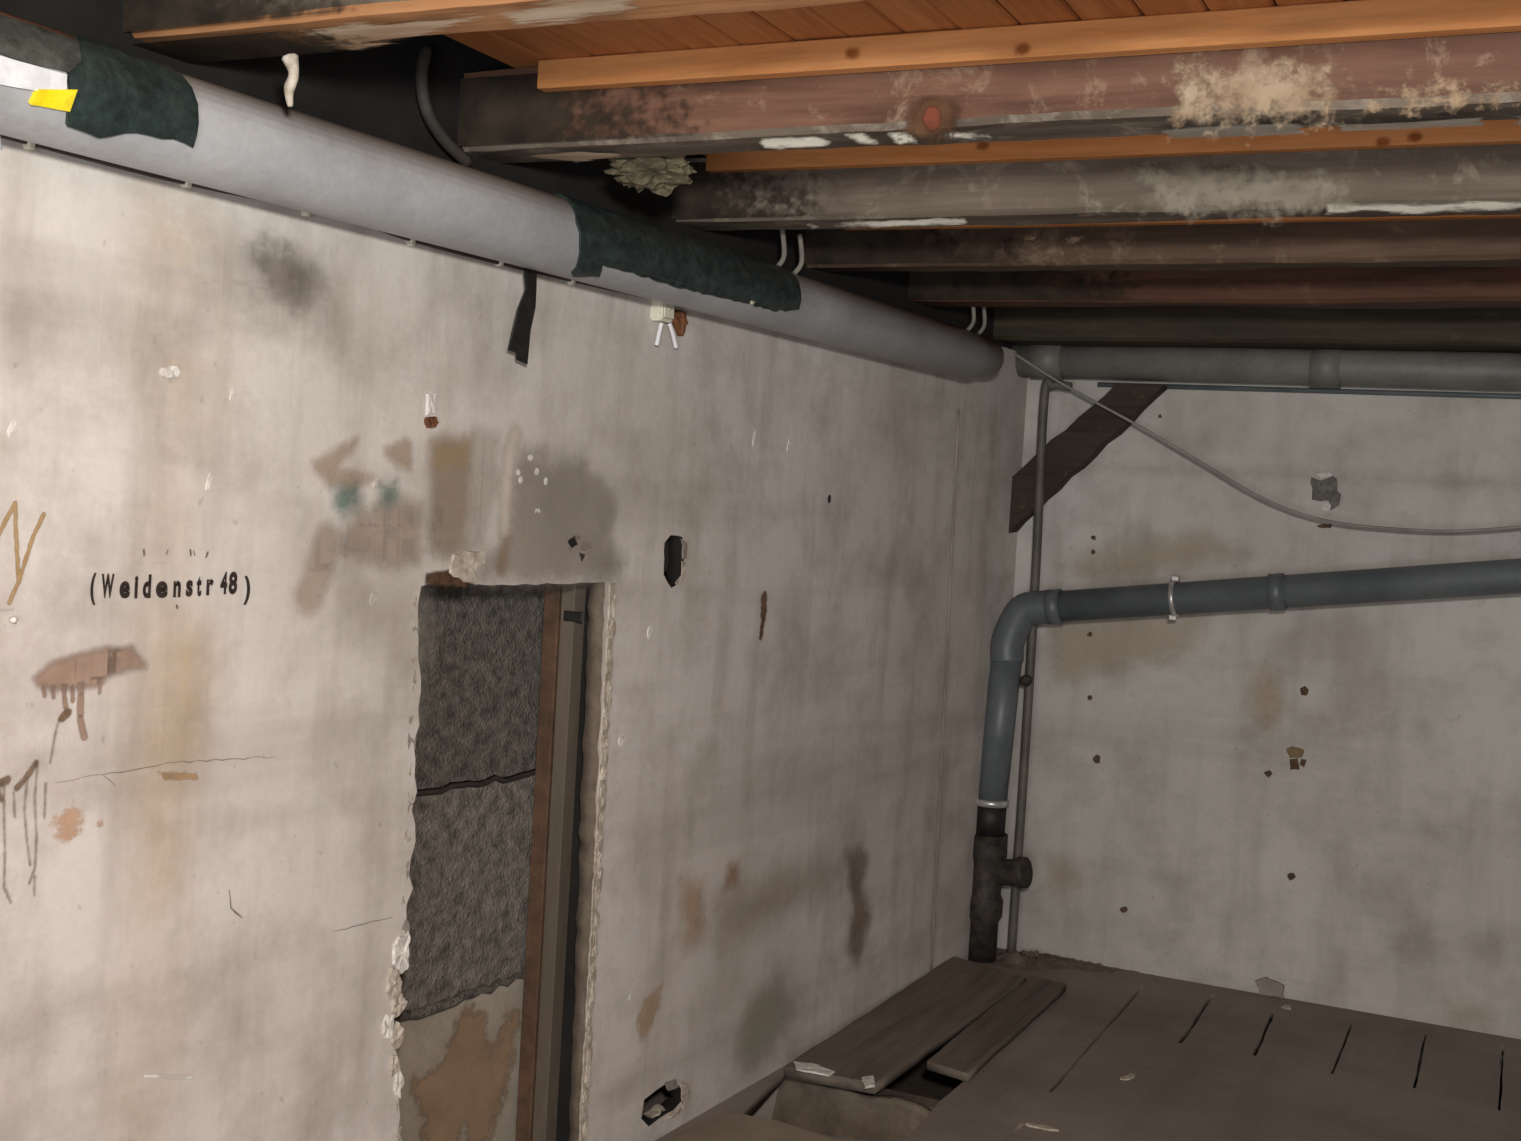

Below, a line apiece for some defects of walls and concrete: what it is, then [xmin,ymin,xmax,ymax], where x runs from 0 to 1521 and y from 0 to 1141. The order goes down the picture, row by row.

peeling [382,831,520,1141]